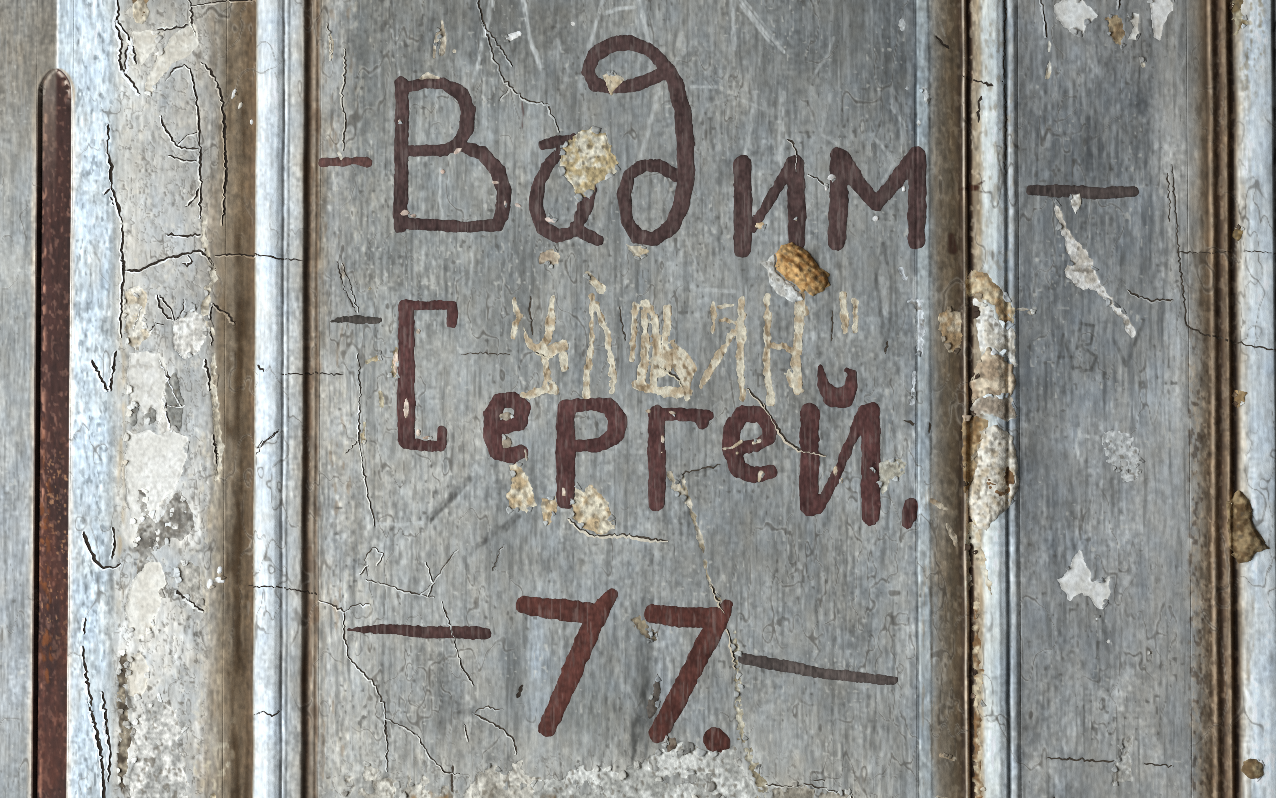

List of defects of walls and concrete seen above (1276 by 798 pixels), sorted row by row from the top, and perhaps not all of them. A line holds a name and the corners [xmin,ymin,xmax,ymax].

peeling [1054,0,1175,50]
crack [90,0,302,432]
flaking render [558,125,621,202]
peeling [1054,193,1136,338]
crack [746,388,826,457]
flaking render [907,270,1036,496]
crack [81,527,122,571]
crack [249,353,523,792]
crack [567,518,668,543]
peeling [1057,550,1111,620]
crack [80,617,112,798]
flaking render [331,631,854,798]